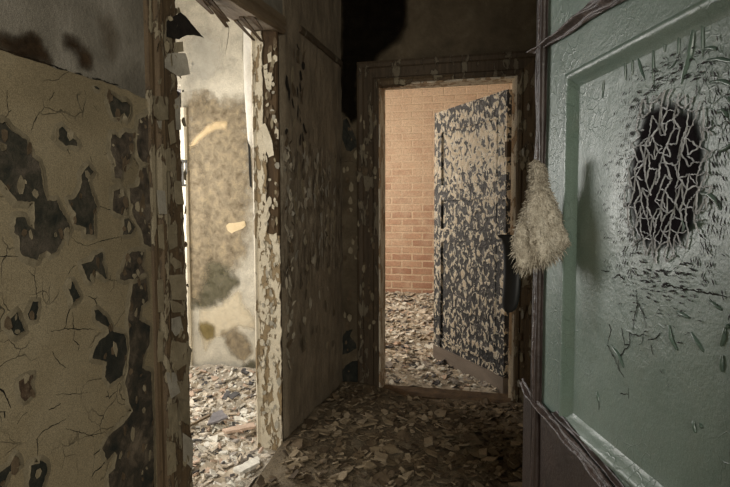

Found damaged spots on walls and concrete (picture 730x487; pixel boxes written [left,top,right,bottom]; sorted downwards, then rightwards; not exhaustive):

leakage [0,32,51,64]
leakage [65,35,92,69]
peeling [157,4,204,81]
leakage [342,59,357,123]
leakage [186,91,256,368]
peeling [255,37,378,443]
peeling [598,47,730,335]
crack [51,309,93,350]
peeling [0,88,193,487]
crack [600,270,726,399]
crack [36,392,105,476]